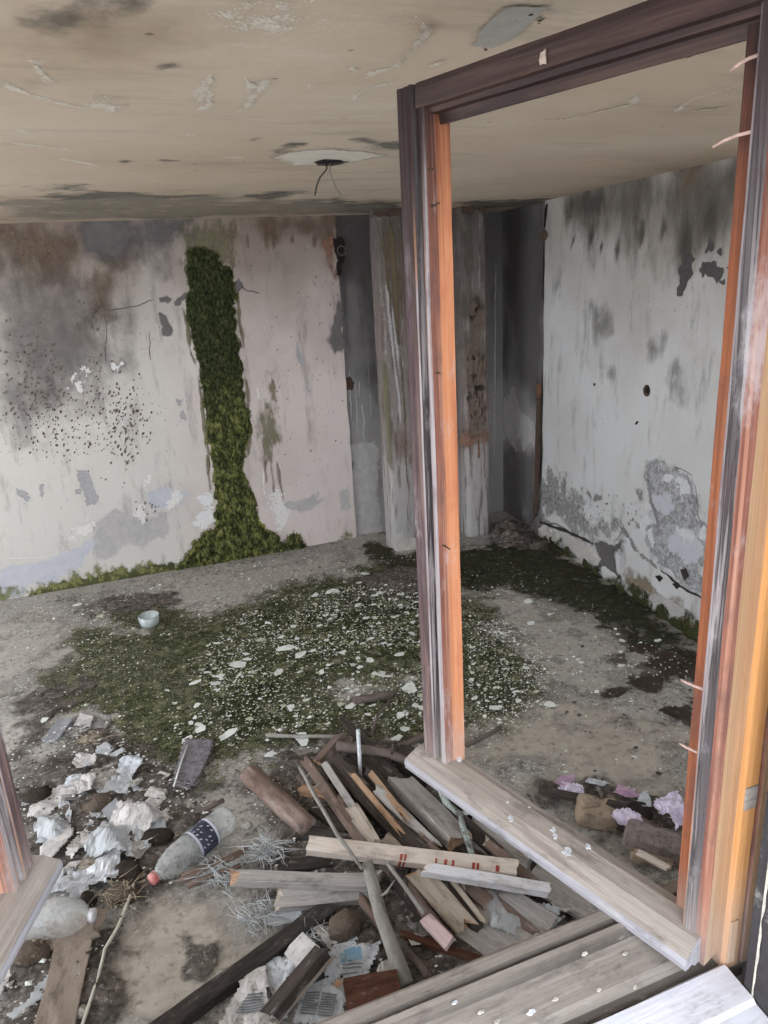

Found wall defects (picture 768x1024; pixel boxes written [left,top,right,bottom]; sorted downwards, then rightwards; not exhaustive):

peeling [468,4,549,51]
damp [43,184,196,200]
damp [245,191,305,199]
peeling [677,238,728,296]
damp [0,219,193,488]
peeling [75,469,99,506]
peeling [0,484,193,599]
crack [541,519,701,598]
flaking render [639,459,707,592]